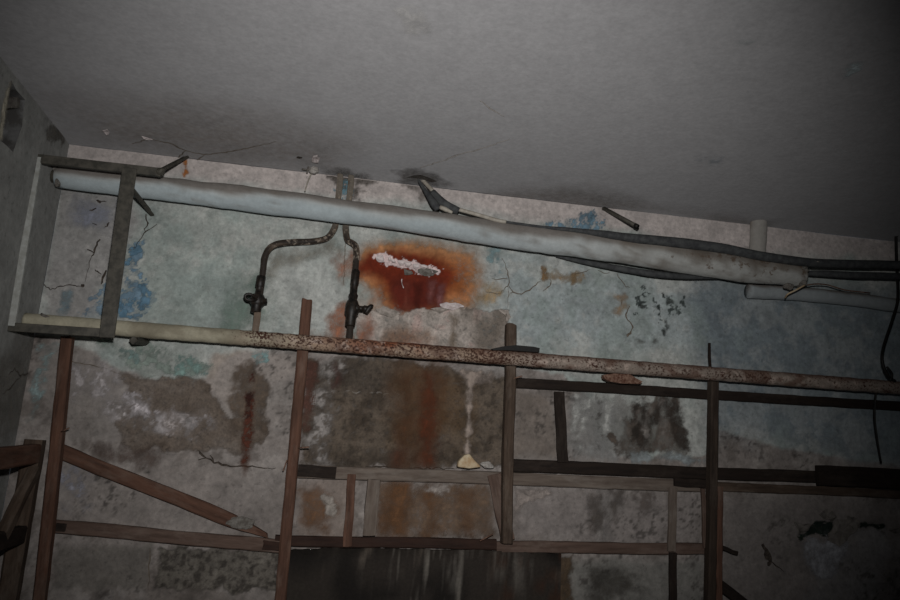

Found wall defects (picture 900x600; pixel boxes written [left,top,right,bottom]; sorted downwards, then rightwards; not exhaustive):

crack [44,200,109,290]
peeling [118,240,151,320]
rust [340,242,502,315]
crack [489,259,552,307]
rust [541,266,584,285]
peeling [546,211,605,230]
water stain [71,363,206,435]
crack [198,450,275,469]
rust [242,393,254,463]
water stain [228,360,269,431]
water stain [306,359,345,464]
water stain [571,392,692,465]